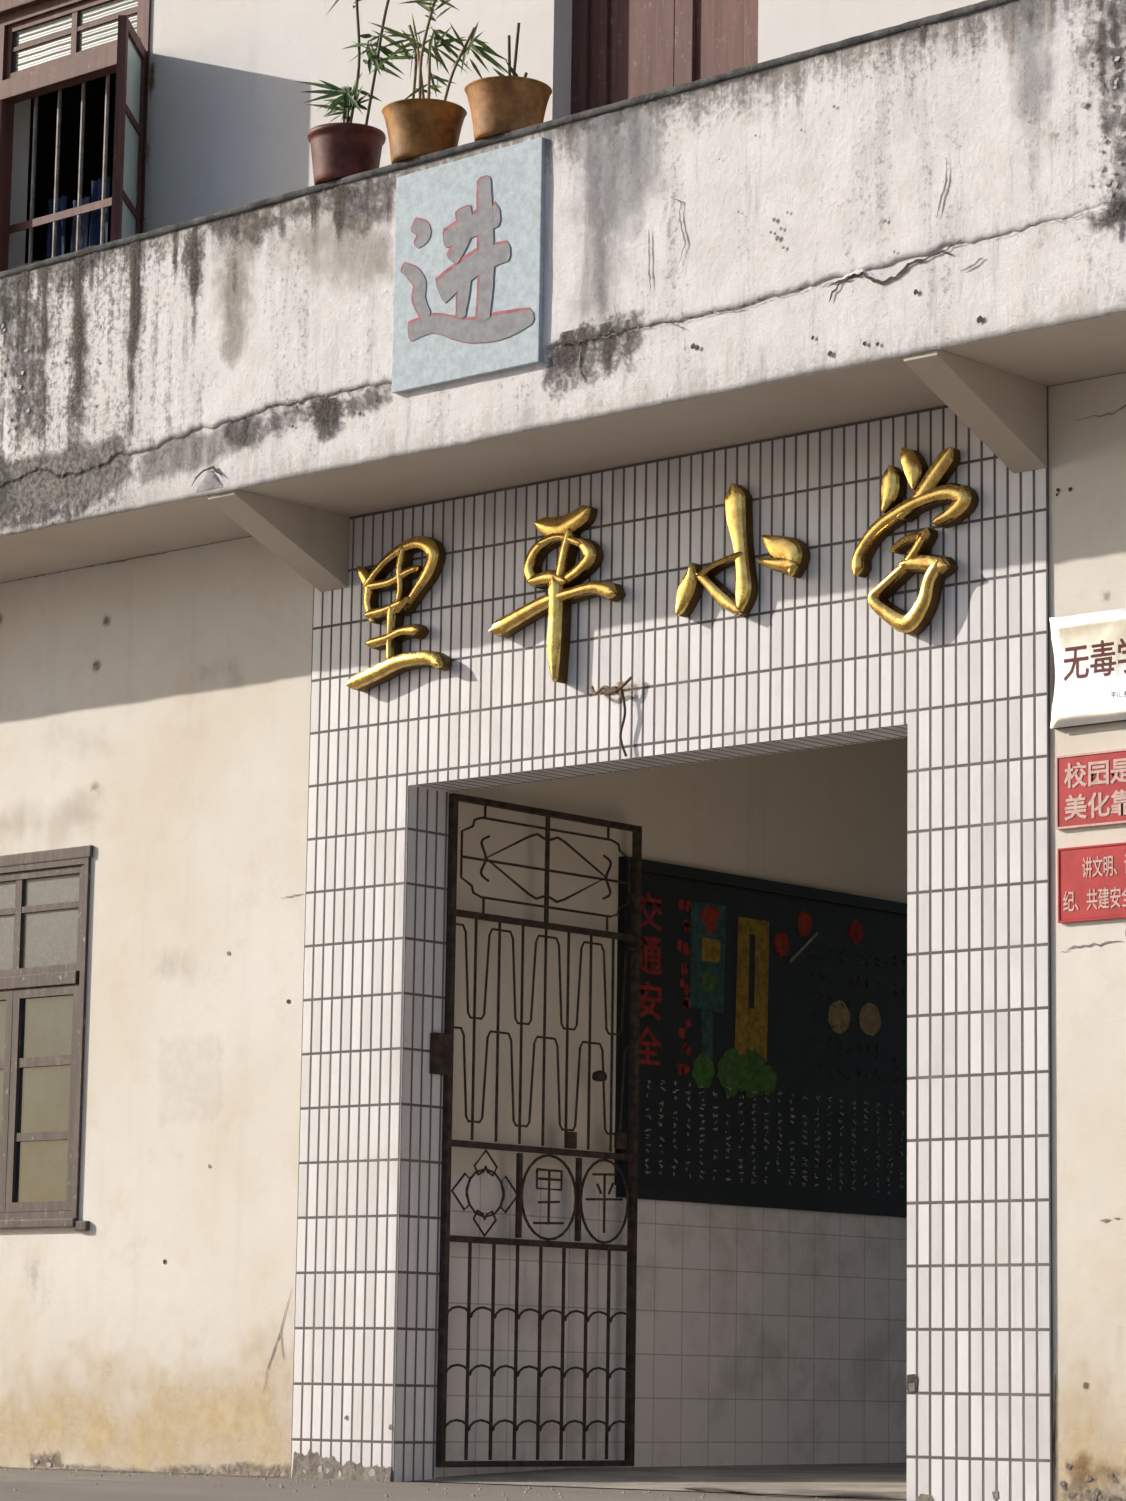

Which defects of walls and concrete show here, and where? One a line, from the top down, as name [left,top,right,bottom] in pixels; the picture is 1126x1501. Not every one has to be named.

damp [1077,0,1126,242]
damp [0,240,390,526]
damp [172,171,406,338]
damp [542,311,643,397]
crack [551,159,1119,382]
damp [1064,1433,1126,1501]